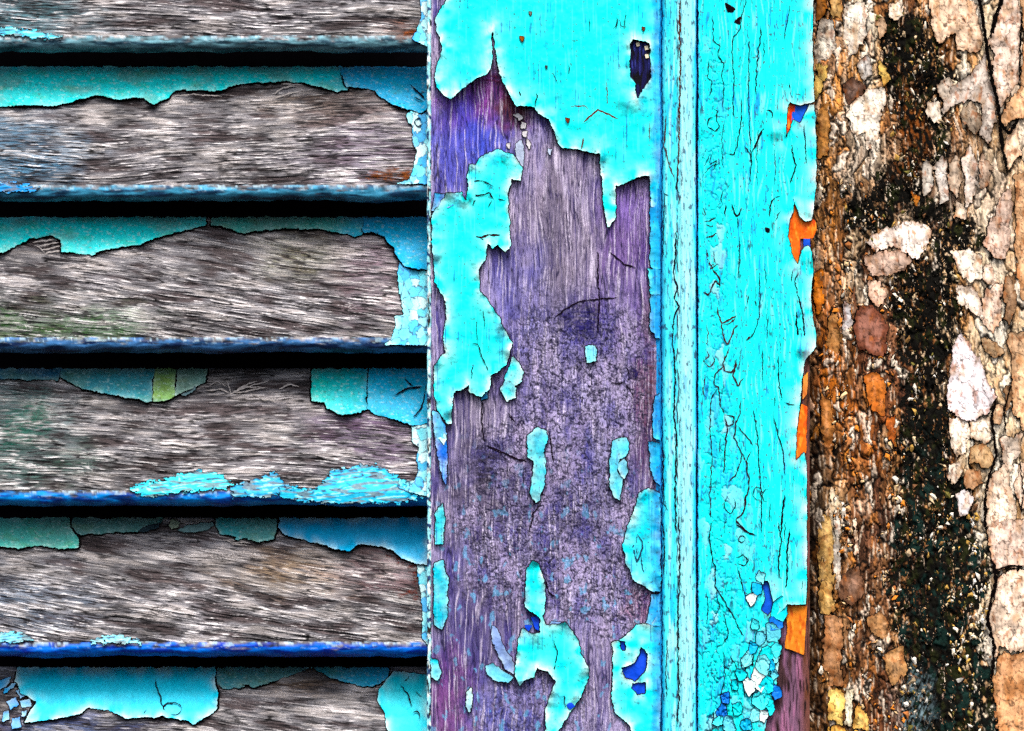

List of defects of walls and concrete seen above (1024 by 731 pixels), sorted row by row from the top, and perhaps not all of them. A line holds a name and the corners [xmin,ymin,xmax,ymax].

crack [572,81,618,149]
peeling [0,0,661,646]
crack [555,251,635,332]
crack [632,0,807,731]
peeling [610,393,663,731]
peeling [0,657,442,731]
peeling [465,687,474,713]
peeling [485,560,590,731]
peeling [711,570,788,731]